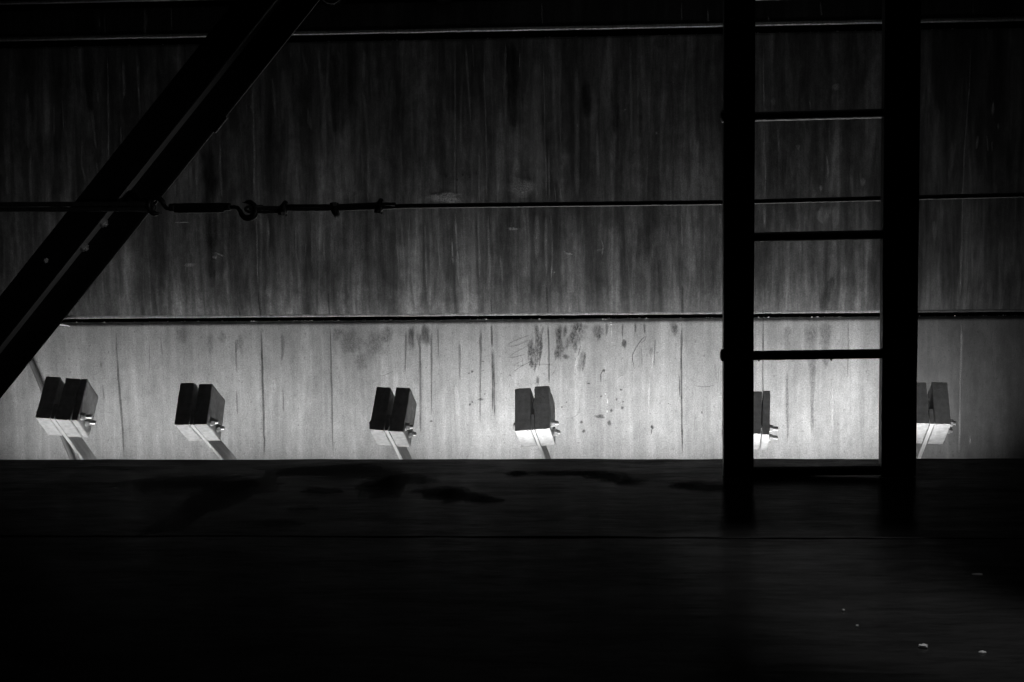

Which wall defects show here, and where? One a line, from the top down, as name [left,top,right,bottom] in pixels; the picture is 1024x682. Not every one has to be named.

leakage [528,325,582,383]